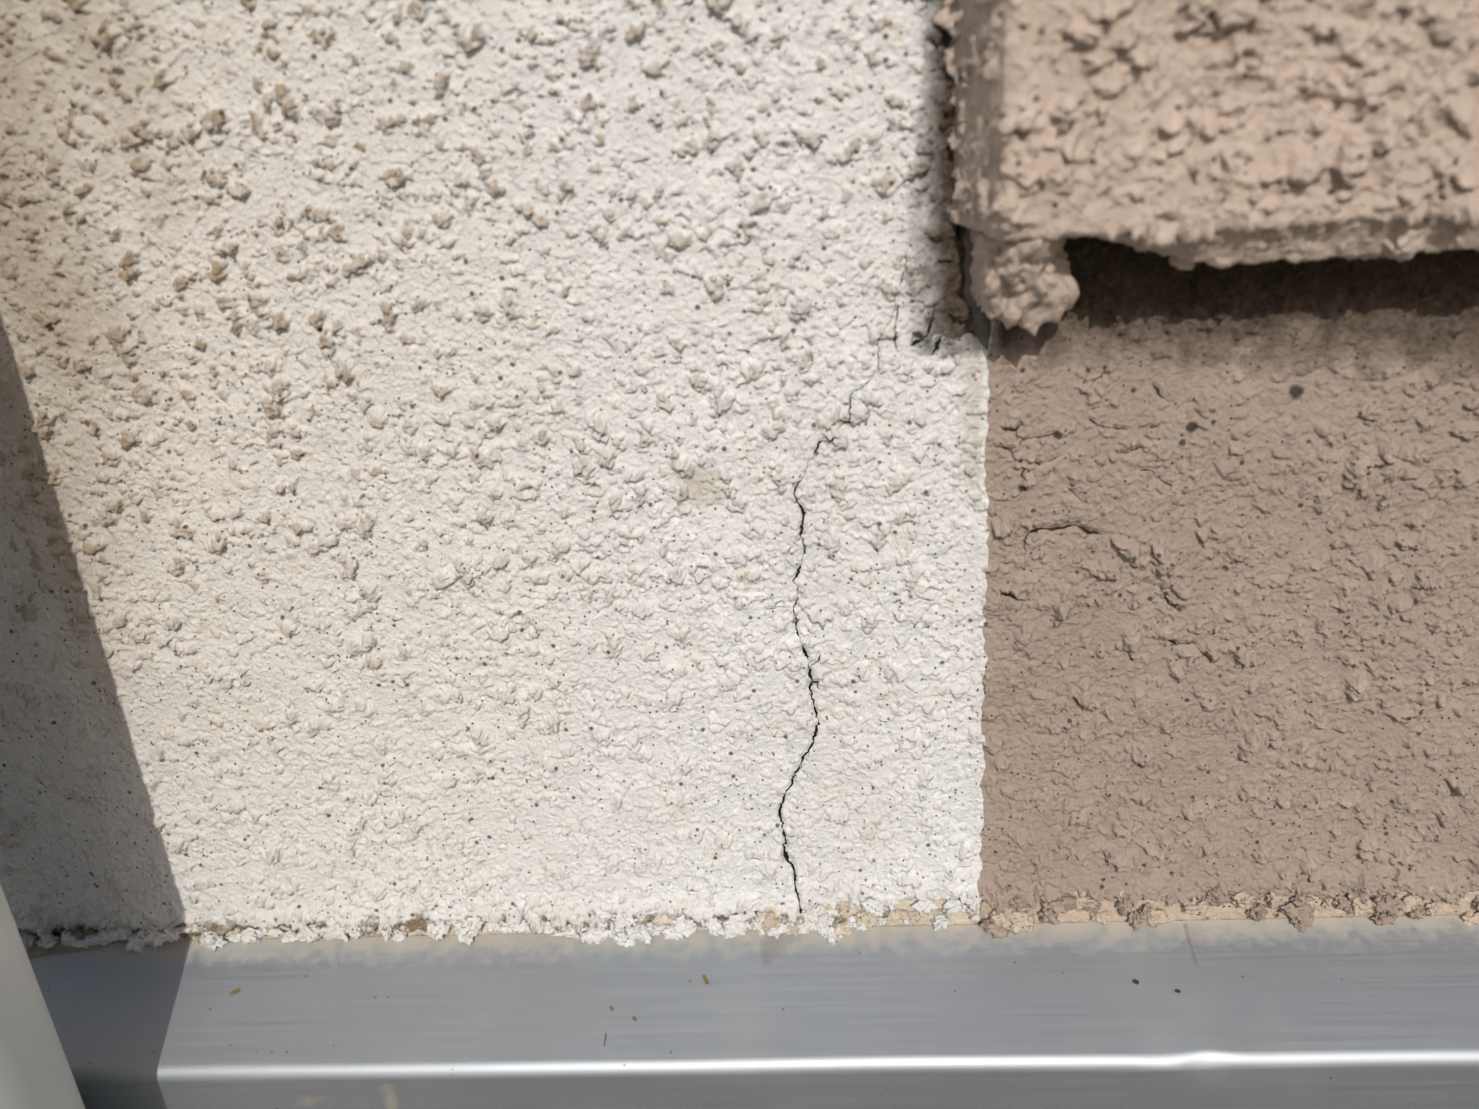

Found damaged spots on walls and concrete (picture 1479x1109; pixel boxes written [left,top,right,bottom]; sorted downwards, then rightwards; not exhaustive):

crack [743,248,943,914]